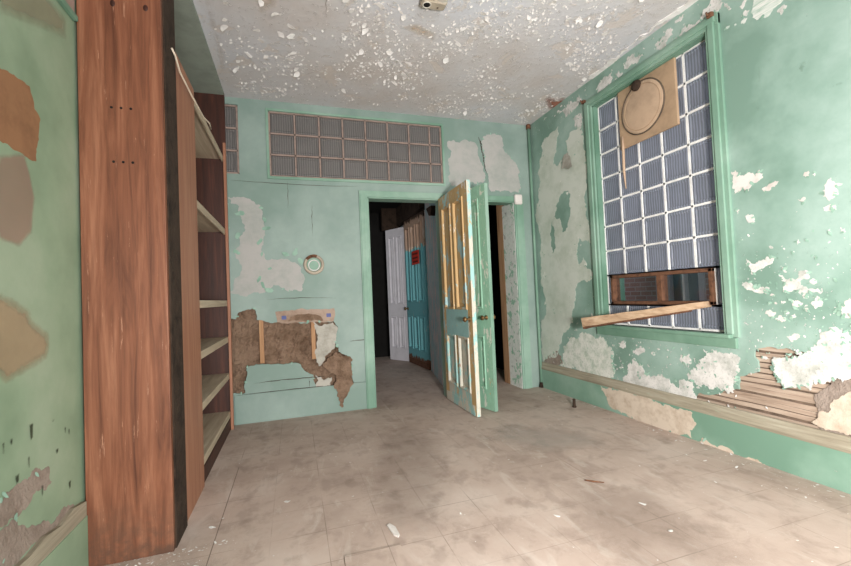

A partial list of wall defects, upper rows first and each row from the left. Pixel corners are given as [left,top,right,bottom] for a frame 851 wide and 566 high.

peeling [0,69,40,161]
peeling [700,438,765,465]